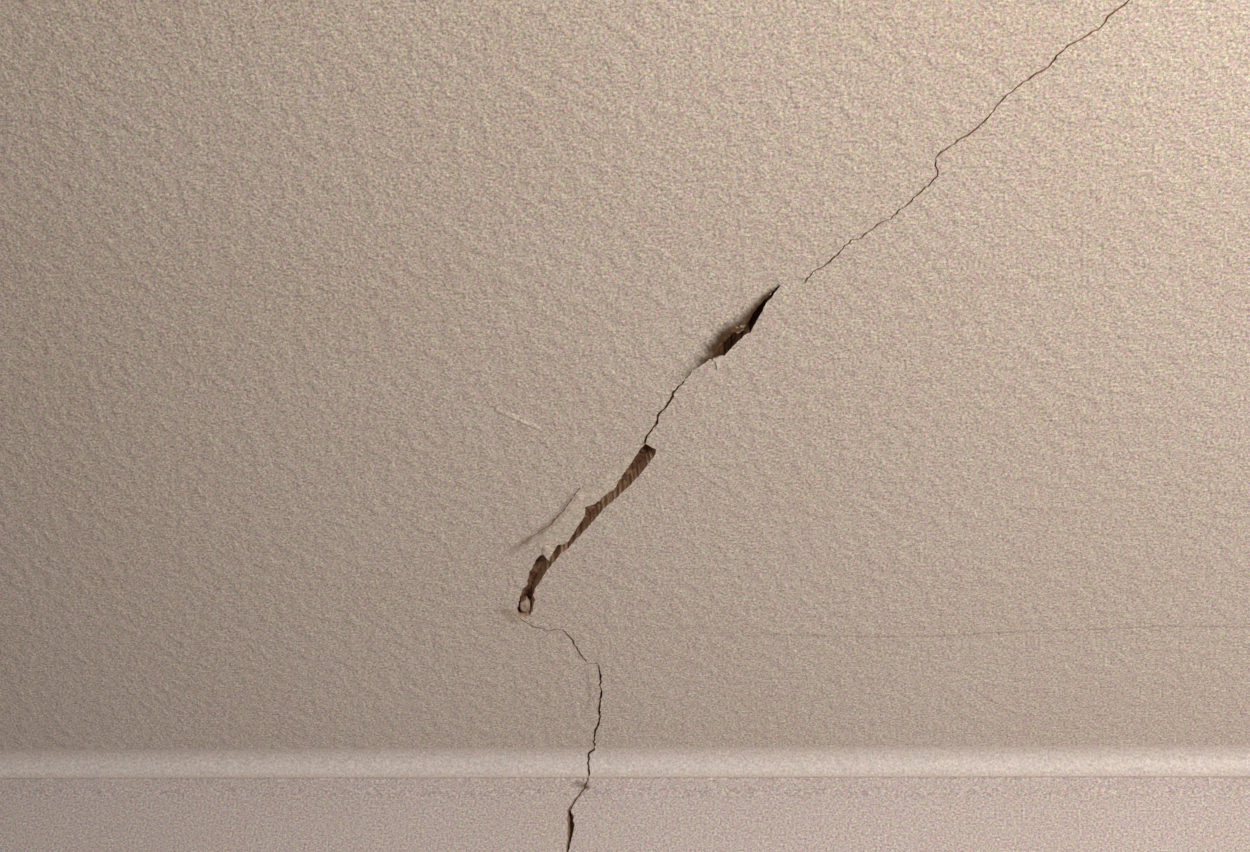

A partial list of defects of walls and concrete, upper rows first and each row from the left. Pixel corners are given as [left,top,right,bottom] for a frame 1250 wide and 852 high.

crack [804,0,1129,284]
crack [643,365,701,446]
crack [518,616,603,852]